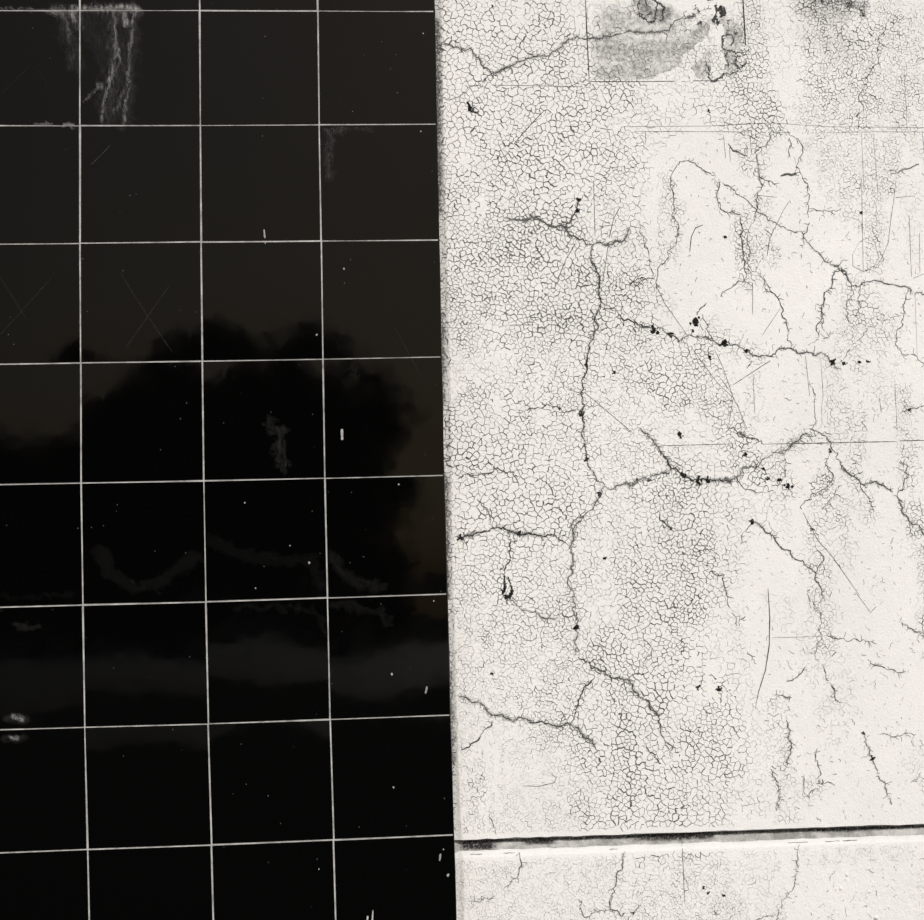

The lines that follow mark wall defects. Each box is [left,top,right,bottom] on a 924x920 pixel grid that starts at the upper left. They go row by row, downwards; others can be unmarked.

crack [436,0,924,920]